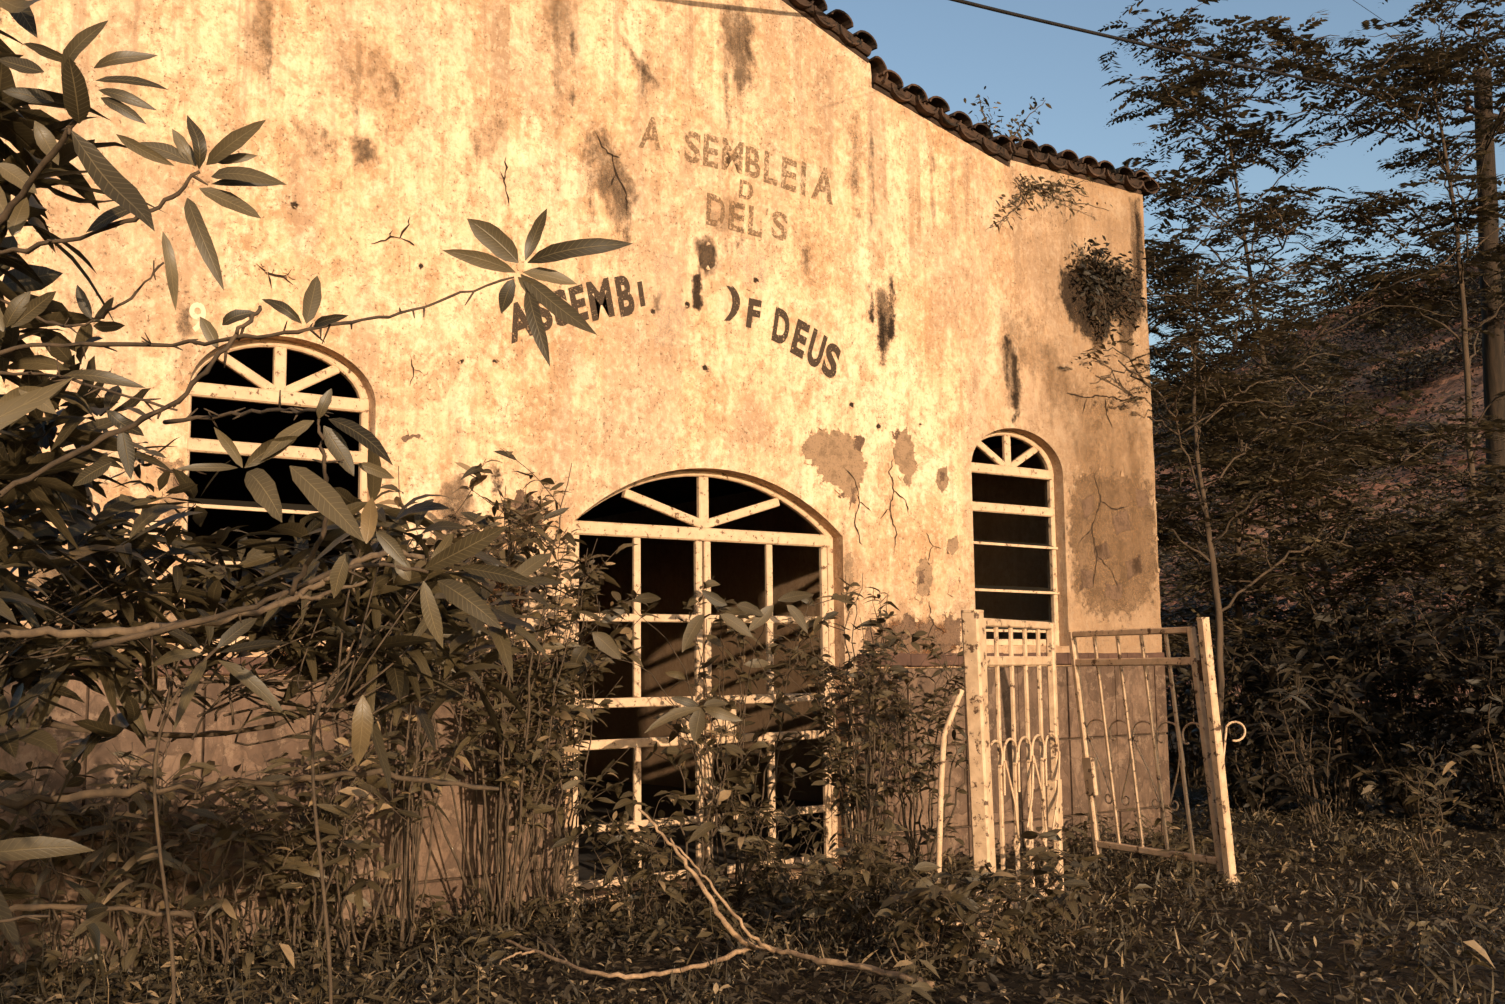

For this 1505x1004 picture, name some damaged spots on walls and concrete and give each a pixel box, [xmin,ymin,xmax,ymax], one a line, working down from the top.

damp [722,10,753,90]
crack [372,217,414,245]
damp [589,137,637,239]
damp [869,277,896,365]
damp [1059,201,1146,356]
damp [1004,335,1021,422]
peeling [802,422,923,510]
peeling [935,465,949,493]
spalling [1066,467,1160,627]